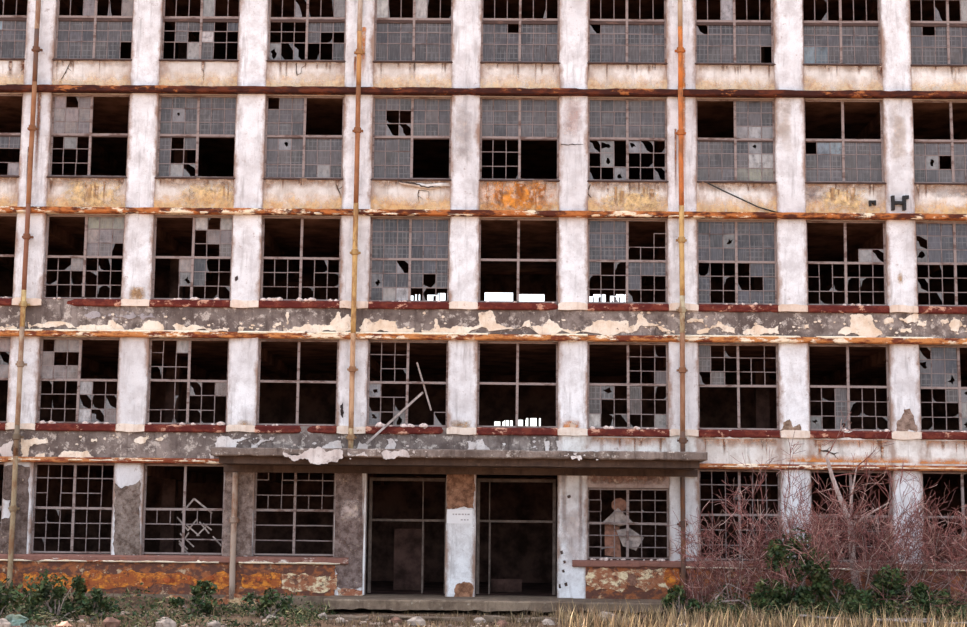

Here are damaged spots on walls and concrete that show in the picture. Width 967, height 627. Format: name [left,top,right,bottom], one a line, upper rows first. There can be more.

rust [482,180,557,211]
peeling [0,308,967,337]
spalling [896,409,918,432]
peeling [58,435,119,457]
peeling [134,435,165,444]
peeling [203,434,275,458]
peeling [283,437,427,465]
peeling [467,439,490,450]
peeling [533,437,626,461]
spalling [0,438,48,554]
spalling [222,472,253,557]
peeling [22,569,363,607]